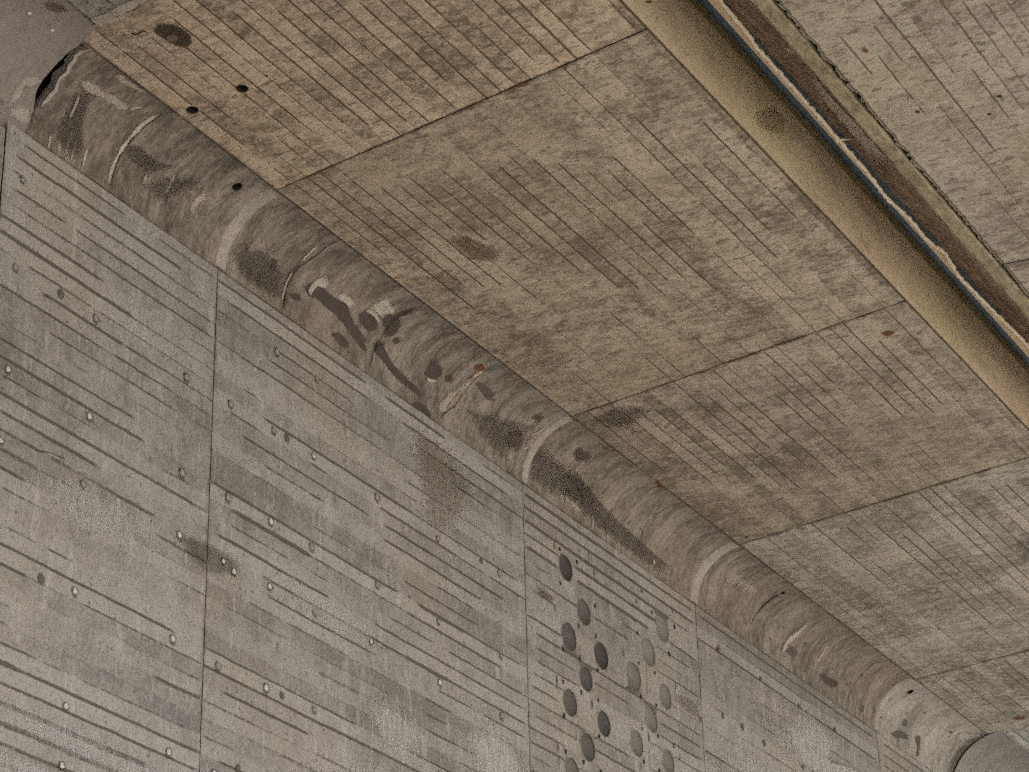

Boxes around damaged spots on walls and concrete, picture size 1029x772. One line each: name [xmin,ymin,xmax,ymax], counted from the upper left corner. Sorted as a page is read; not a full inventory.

spalling [724,0,1029,343]
leakage [440,371,483,411]
leakage [575,449,591,461]
leakage [573,482,655,564]